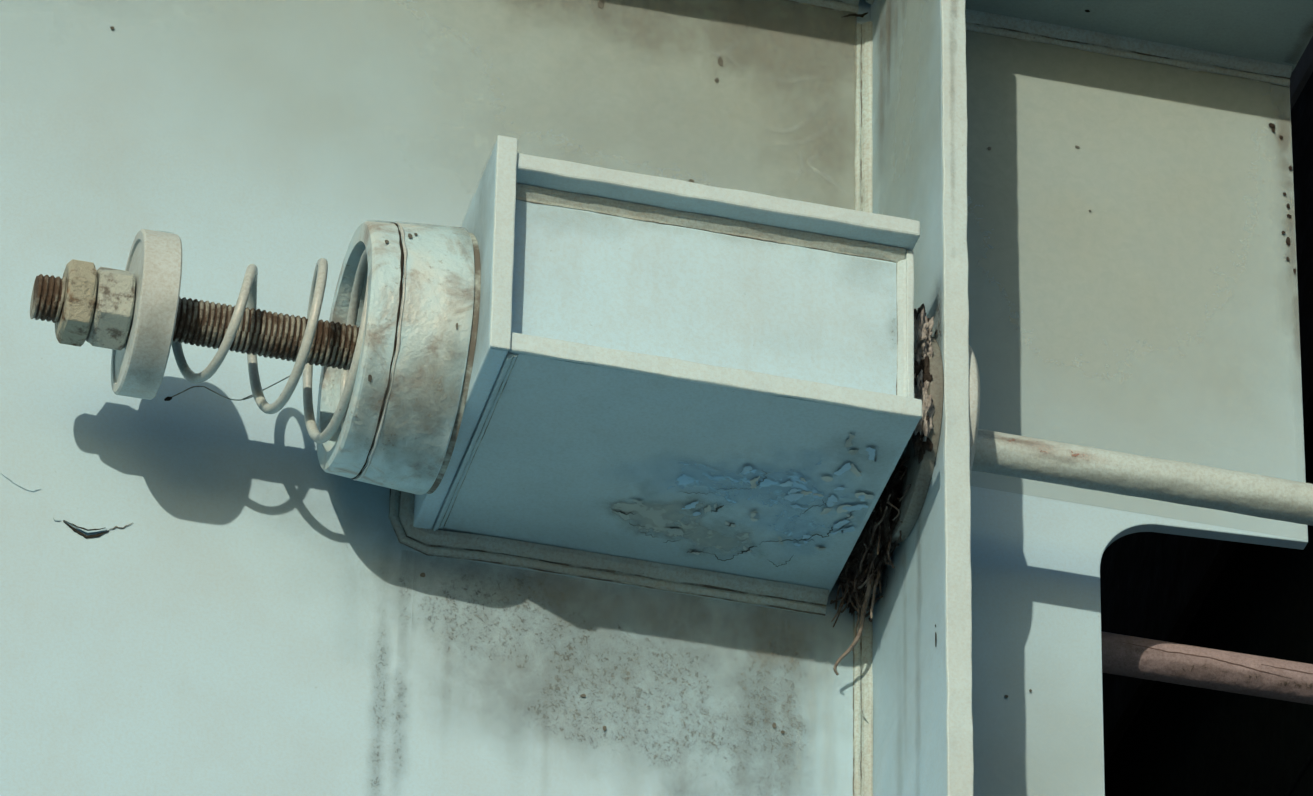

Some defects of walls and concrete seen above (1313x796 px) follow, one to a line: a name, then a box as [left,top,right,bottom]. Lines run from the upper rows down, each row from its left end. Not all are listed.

crack [53,518,132,538]
damp [528,622,806,769]